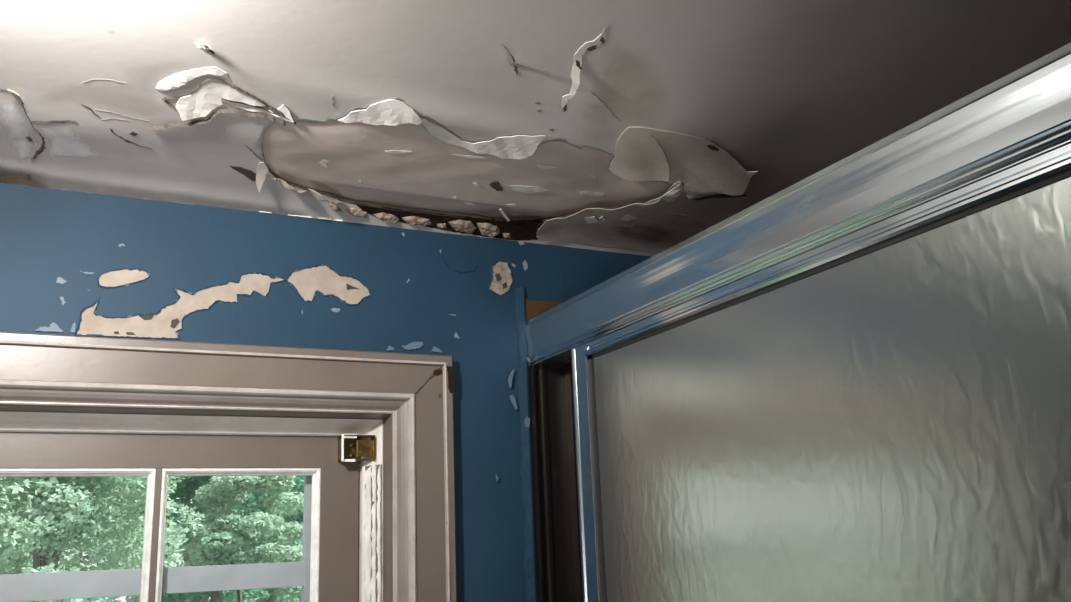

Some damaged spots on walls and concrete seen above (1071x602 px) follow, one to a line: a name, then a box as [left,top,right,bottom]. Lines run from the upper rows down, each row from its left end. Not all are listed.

flaking render [229,96,712,252]
peeling [75,264,371,340]
peeling [487,260,528,297]